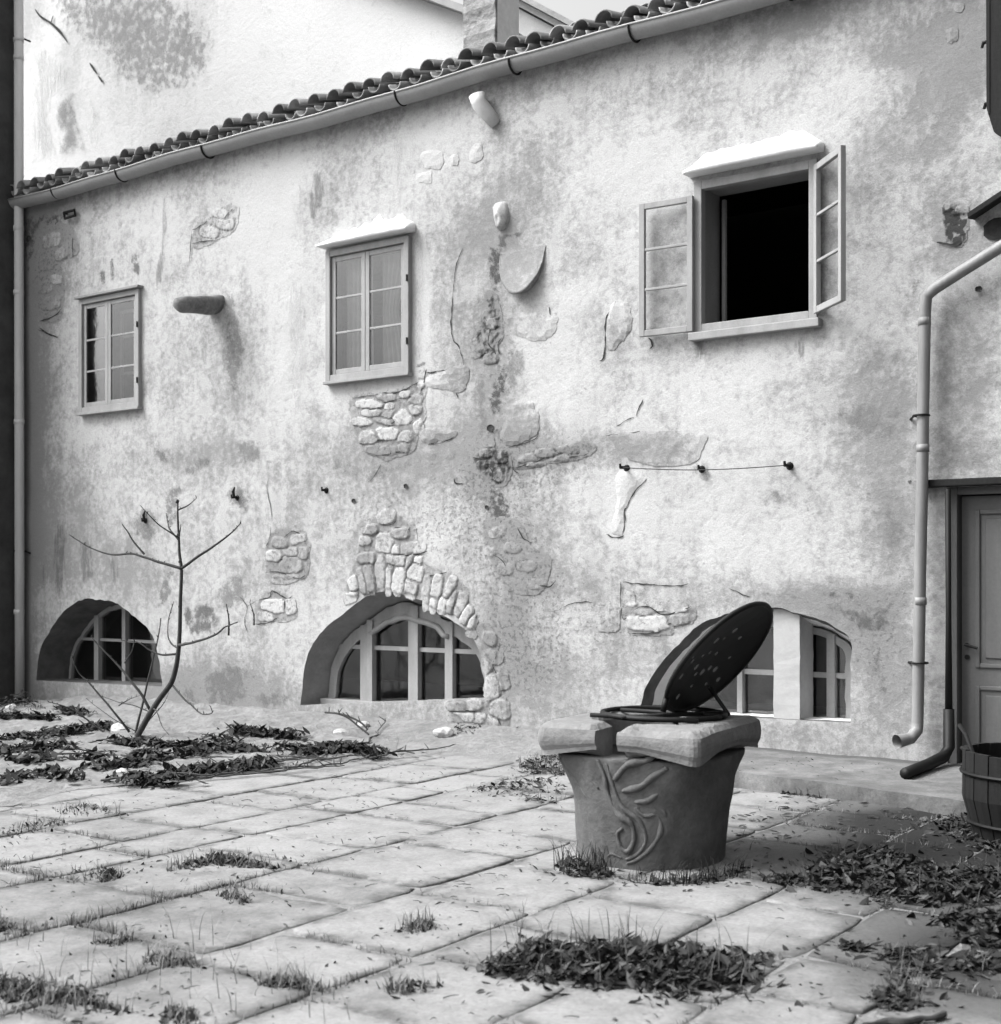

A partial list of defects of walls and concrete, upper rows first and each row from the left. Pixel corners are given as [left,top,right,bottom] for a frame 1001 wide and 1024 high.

spalling [189,203,239,261]
water stain [489,233,520,290]
spalling [936,201,969,247]
crack [450,251,464,364]
spalling [347,290,558,462]
water stain [490,369,505,414]
water stain [490,490,508,523]
peeling [473,398,596,487]
peeling [607,430,708,538]
spalling [256,527,311,625]
spalling [343,508,511,726]
spalling [593,583,697,636]